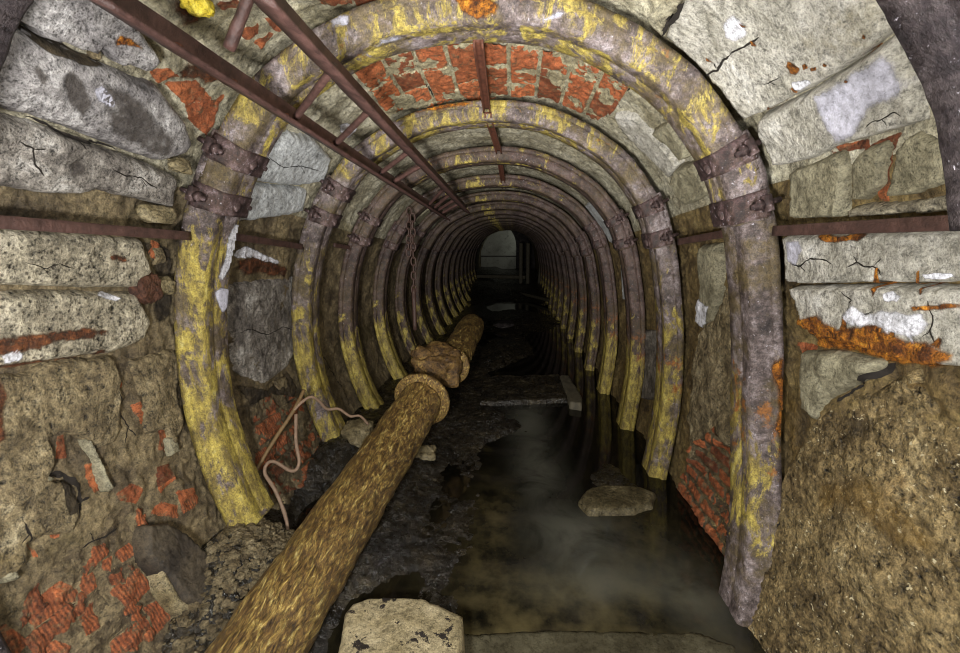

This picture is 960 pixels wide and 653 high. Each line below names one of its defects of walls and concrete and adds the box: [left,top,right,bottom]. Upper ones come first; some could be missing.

flaking render [353,43,632,120]
crack [706,37,759,76]
efflorescence [815,59,899,140]
crack [19,116,157,189]
crack [790,257,881,275]
corrosion [0,328,107,368]
corrosion [796,316,951,366]
efflorescence [843,292,925,343]
corrosion [772,359,784,435]
flaking render [676,427,731,557]
flaking render [18,502,188,653]